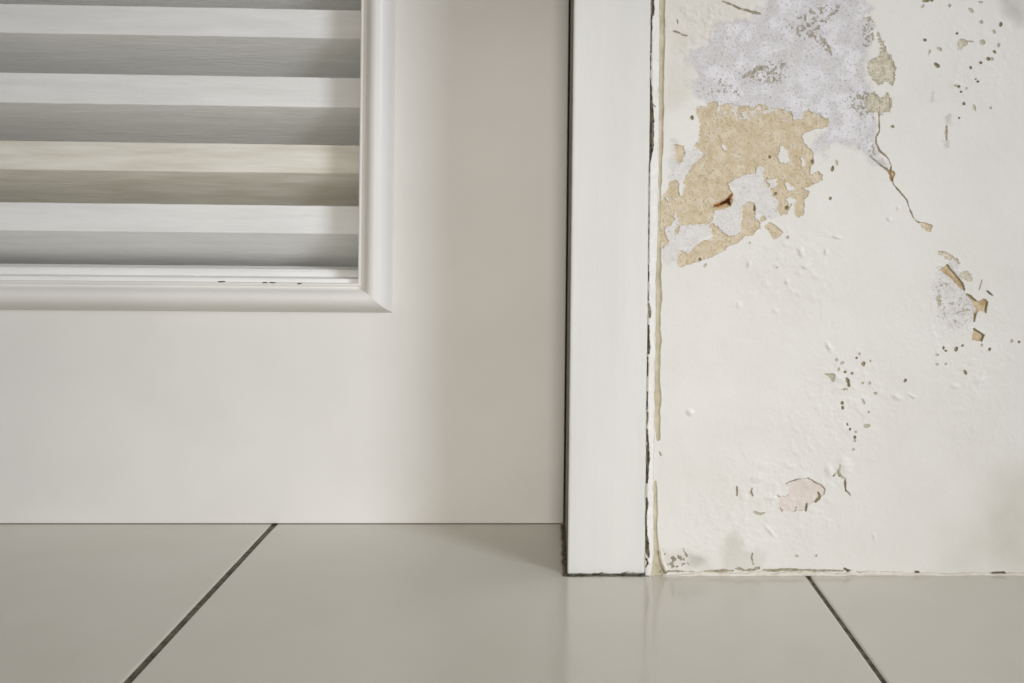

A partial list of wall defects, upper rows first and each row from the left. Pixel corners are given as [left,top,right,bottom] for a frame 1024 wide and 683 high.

water stain [690,0,882,164]
peeling [654,0,838,456]
crack [869,113,933,232]
flaking render [932,251,991,365]
peeling [651,481,669,576]
peeling [778,478,825,512]